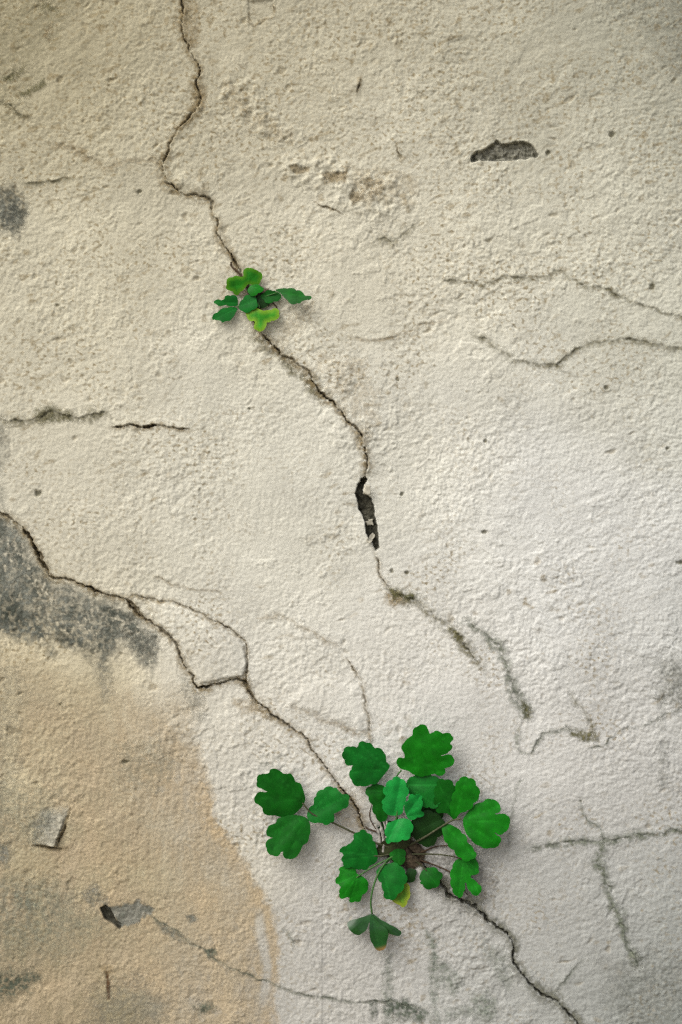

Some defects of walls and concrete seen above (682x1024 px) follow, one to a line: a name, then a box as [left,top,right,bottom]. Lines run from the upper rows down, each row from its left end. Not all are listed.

crack [160,0,248,293]
spalling [471,141,550,162]
crack [13,411,183,430]
crack [256,331,368,479]
water stain [0,518,156,665]
crack [3,514,365,829]
crack [378,560,612,751]
peeling [38,809,68,849]
spalling [89,889,153,929]
water stain [0,713,276,1024]
crack [424,864,583,1024]